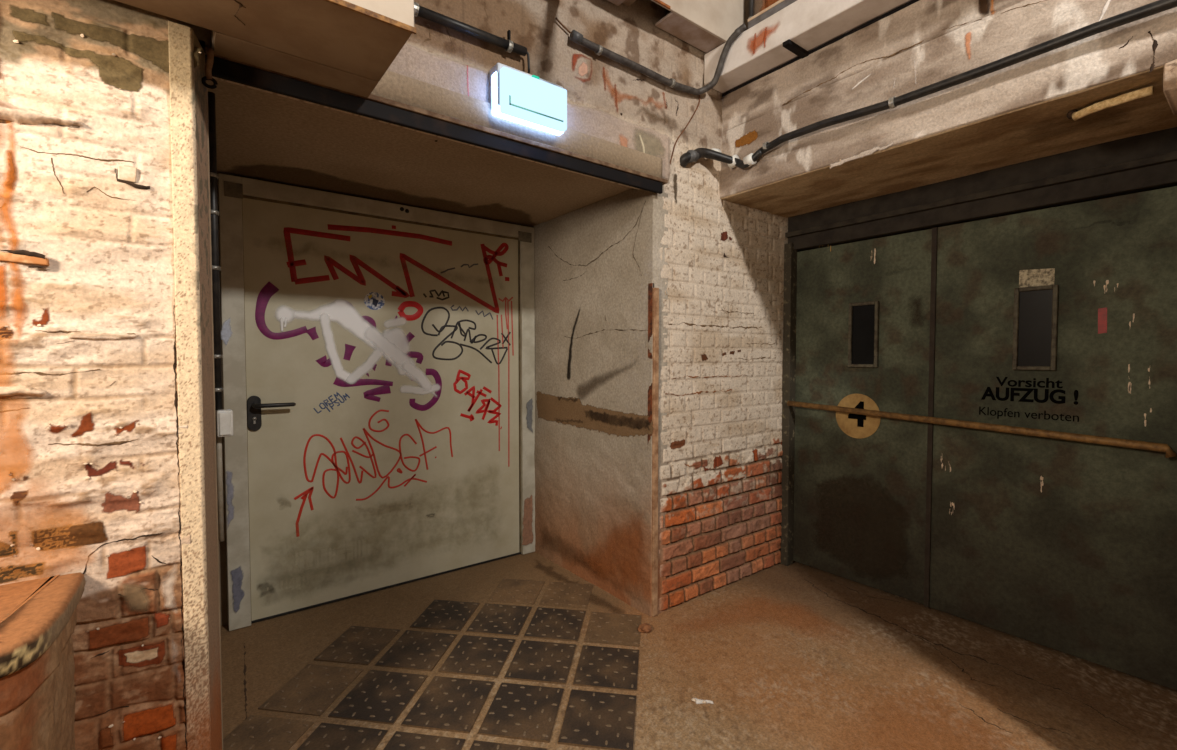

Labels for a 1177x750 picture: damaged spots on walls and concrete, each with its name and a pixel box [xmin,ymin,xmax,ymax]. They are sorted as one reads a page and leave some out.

crack [0,119,136,201]
peeling [0,326,13,340]
peeling [46,413,94,437]
peeling [114,420,139,435]
peeling [84,460,144,479]
peeling [9,472,28,505]
flaking render [0,490,146,584]